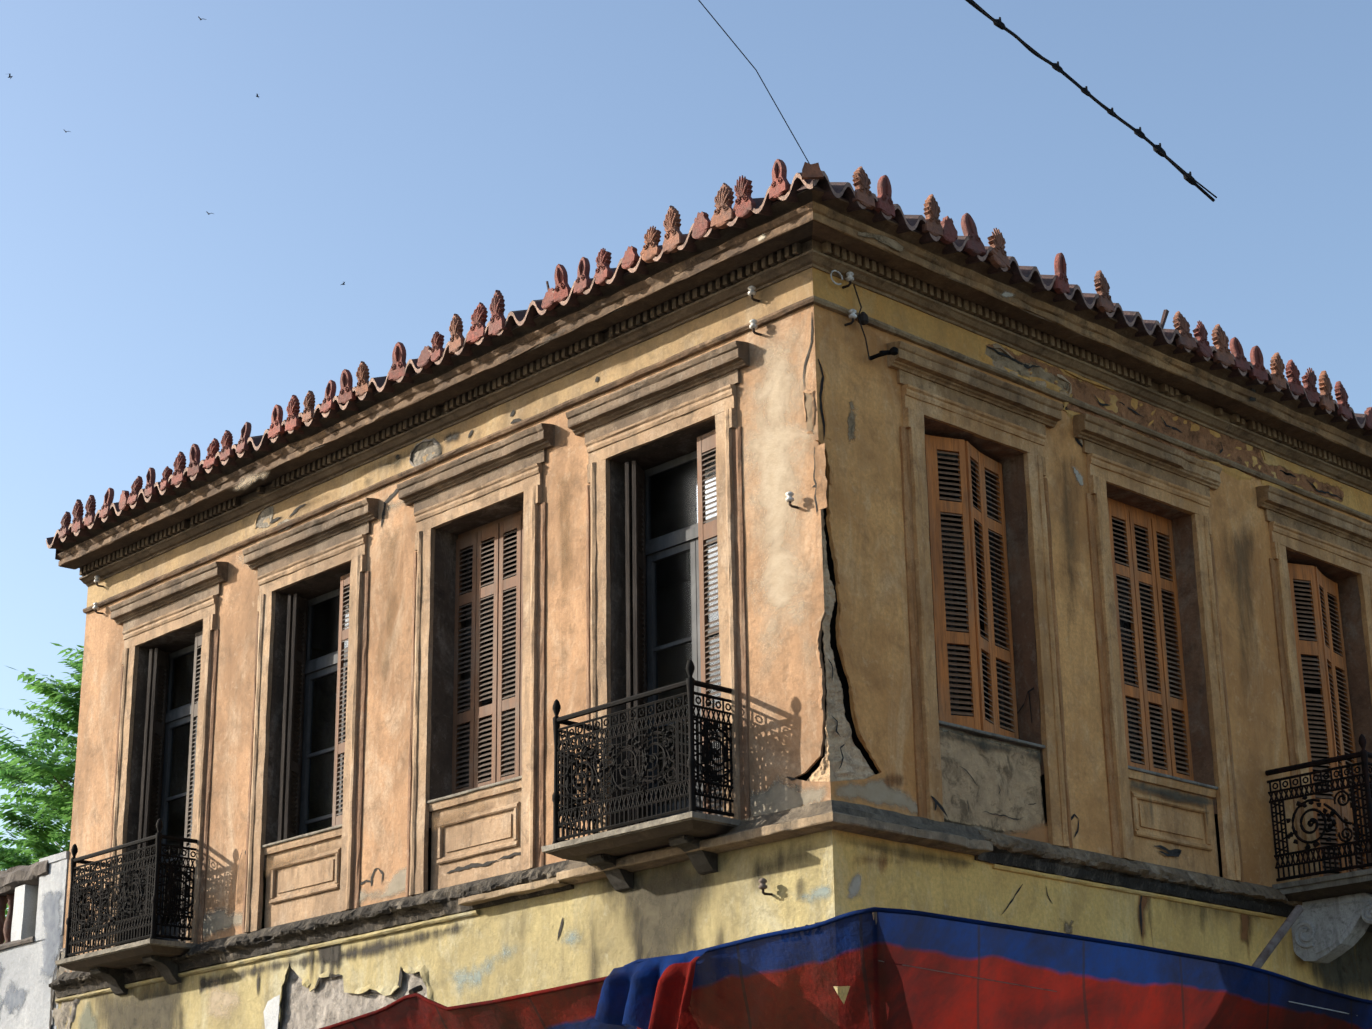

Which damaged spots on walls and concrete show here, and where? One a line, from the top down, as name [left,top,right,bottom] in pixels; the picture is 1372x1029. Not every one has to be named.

spalling [796,389,879,782]
spalling [939,729,1045,833]
leakage [200,924,458,994]
leakage [79,979,183,1029]
flaking render [263,964,434,1029]